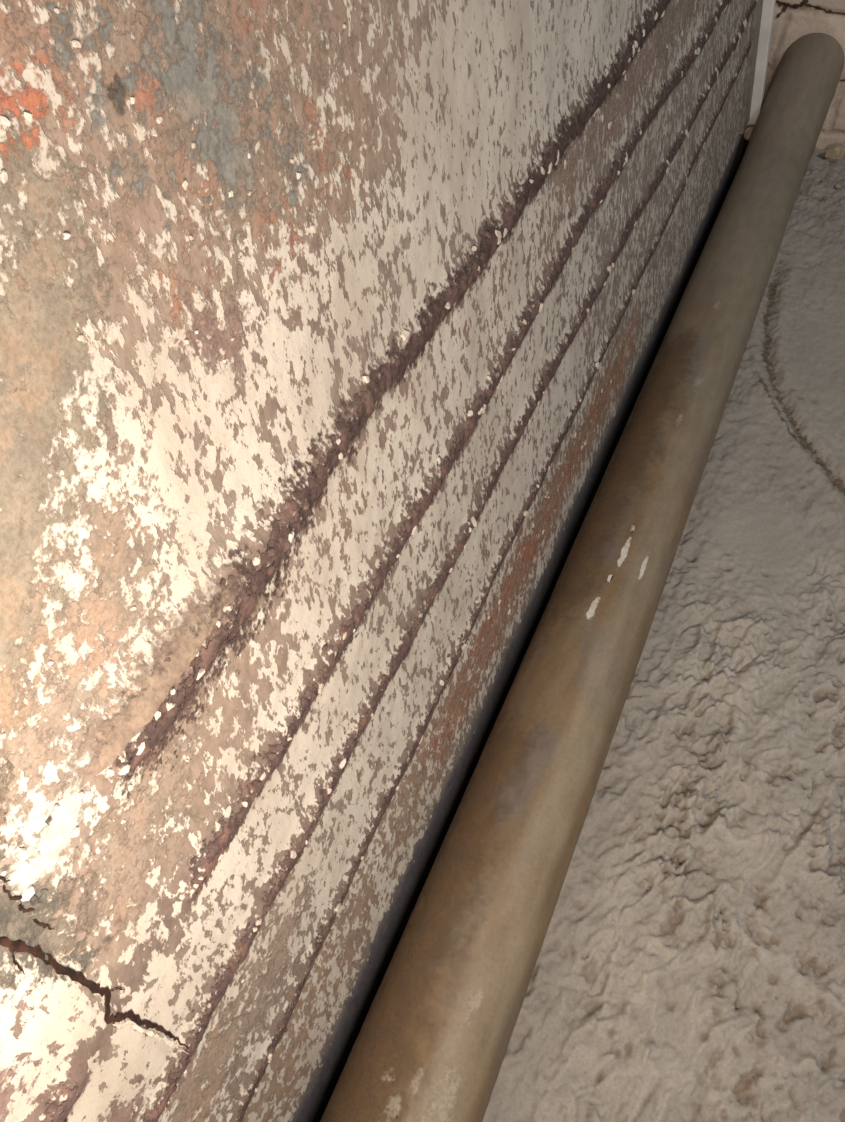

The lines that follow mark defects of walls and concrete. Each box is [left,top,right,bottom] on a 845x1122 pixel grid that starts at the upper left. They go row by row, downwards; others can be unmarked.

peeling [0,0,399,1001]
rust [106,0,758,1122]
peeling [415,323,623,788]
efflorescence [6,719,100,902]
peeling [0,1059,42,1122]
rust [42,1081,82,1122]
crack [0,938,189,1054]
peeling [98,867,321,1122]